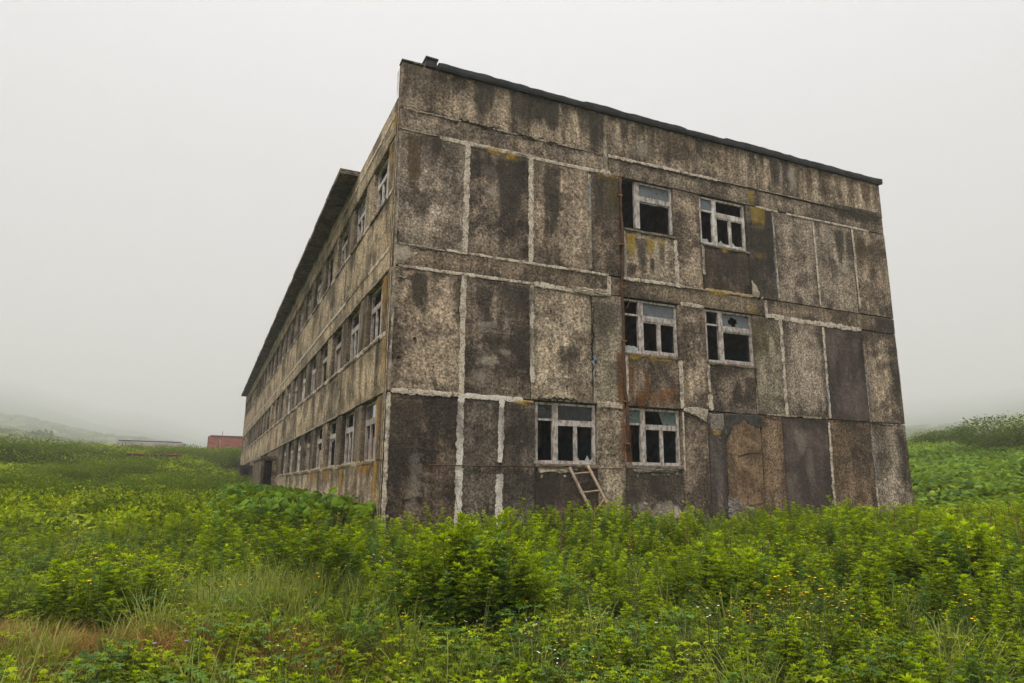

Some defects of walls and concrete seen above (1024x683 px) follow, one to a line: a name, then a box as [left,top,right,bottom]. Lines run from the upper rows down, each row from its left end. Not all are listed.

water stain [407,134,442,193]
water stain [474,82,495,115]
water stain [487,154,526,243]
water stain [511,91,559,128]
water stain [577,110,604,153]
water stain [749,153,881,223]
water stain [375,398,466,481]
corrosion [617,353,675,460]
peeling [683,403,764,522]